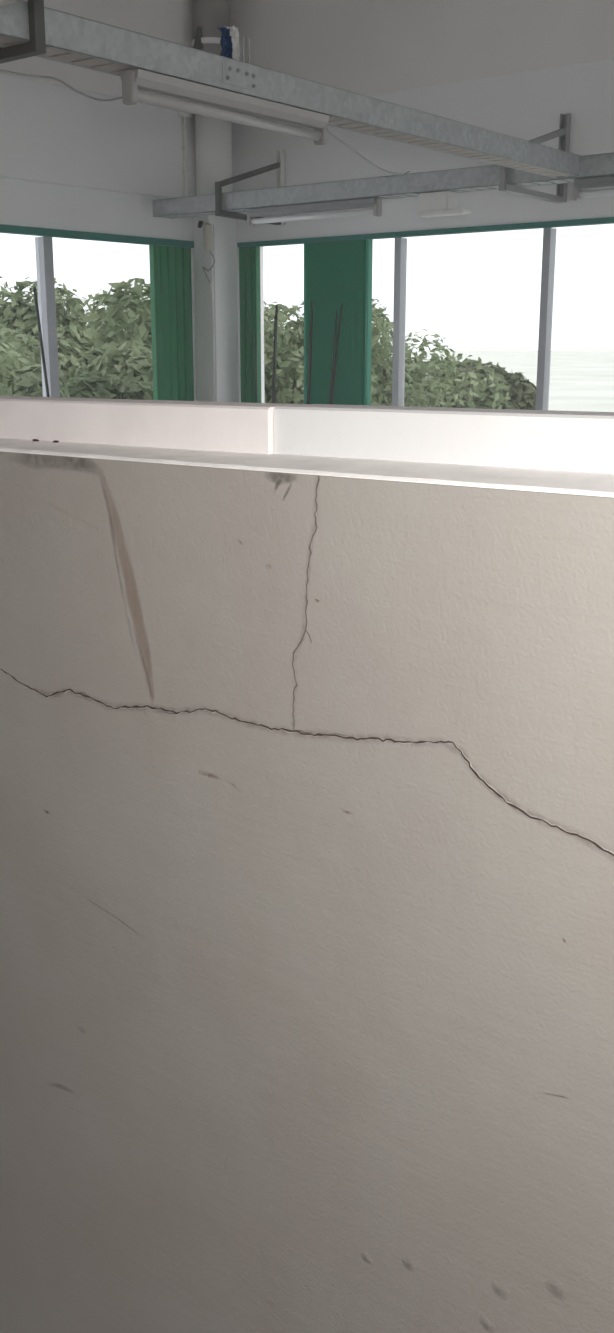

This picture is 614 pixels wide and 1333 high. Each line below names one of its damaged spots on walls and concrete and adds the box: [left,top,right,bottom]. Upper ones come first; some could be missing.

crack [0,475,614,857]